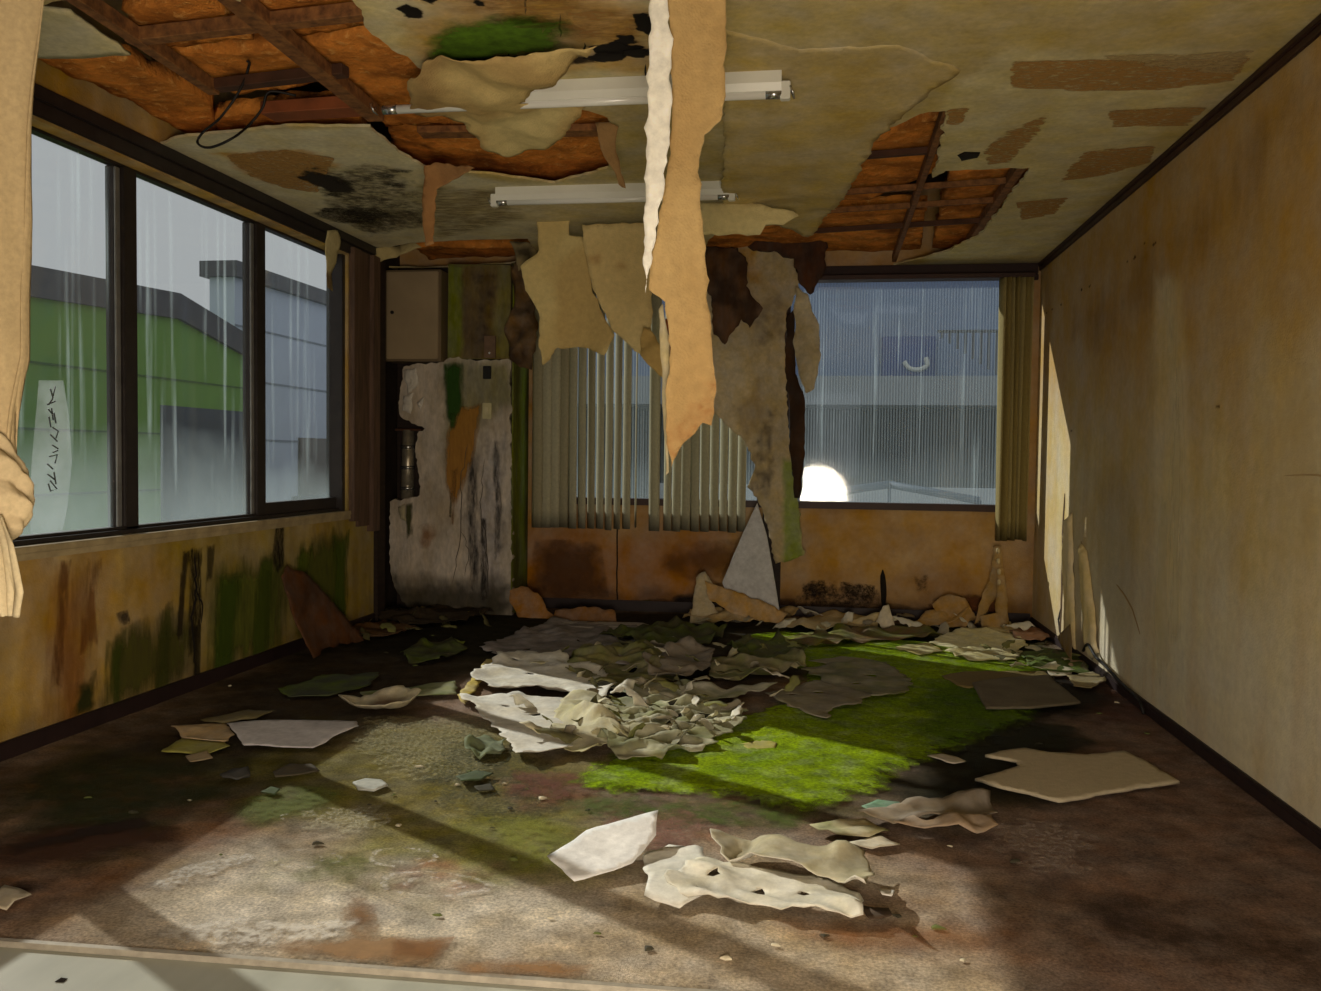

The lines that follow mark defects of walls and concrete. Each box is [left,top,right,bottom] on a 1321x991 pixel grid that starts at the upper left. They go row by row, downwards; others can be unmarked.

water stain [396,0,437,19]
water stain [473,0,651,64]
peeling [984,118,1046,164]
water stain [298,166,508,235]
peeling [705,246,763,344]
spalling [402,368,424,414]
water stain [55,564,93,714]
water stain [107,528,349,703]